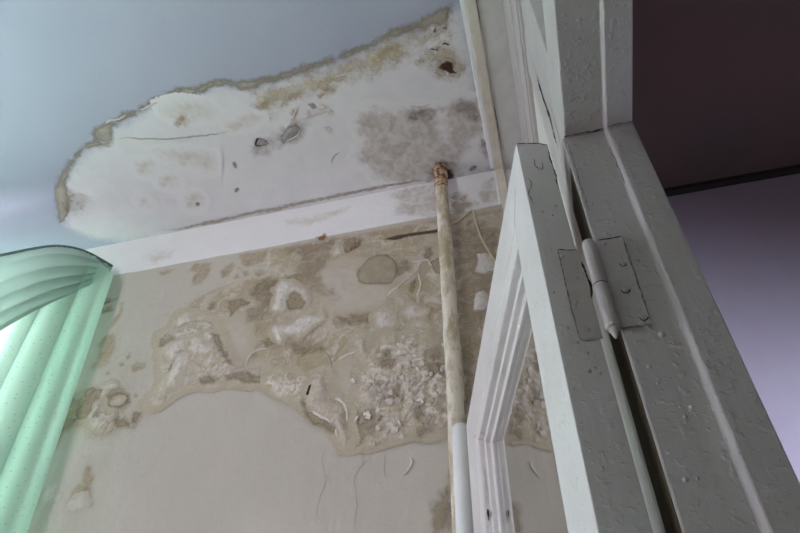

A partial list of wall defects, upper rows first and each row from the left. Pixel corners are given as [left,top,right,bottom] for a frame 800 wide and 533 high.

spalling [436,58,456,77]
flaking render [281,124,300,143]
leakage [47,0,503,453]
flaking render [475,252,495,275]
flaking render [473,290,489,312]
flaking render [346,325,448,457]
peeling [38,459,102,517]